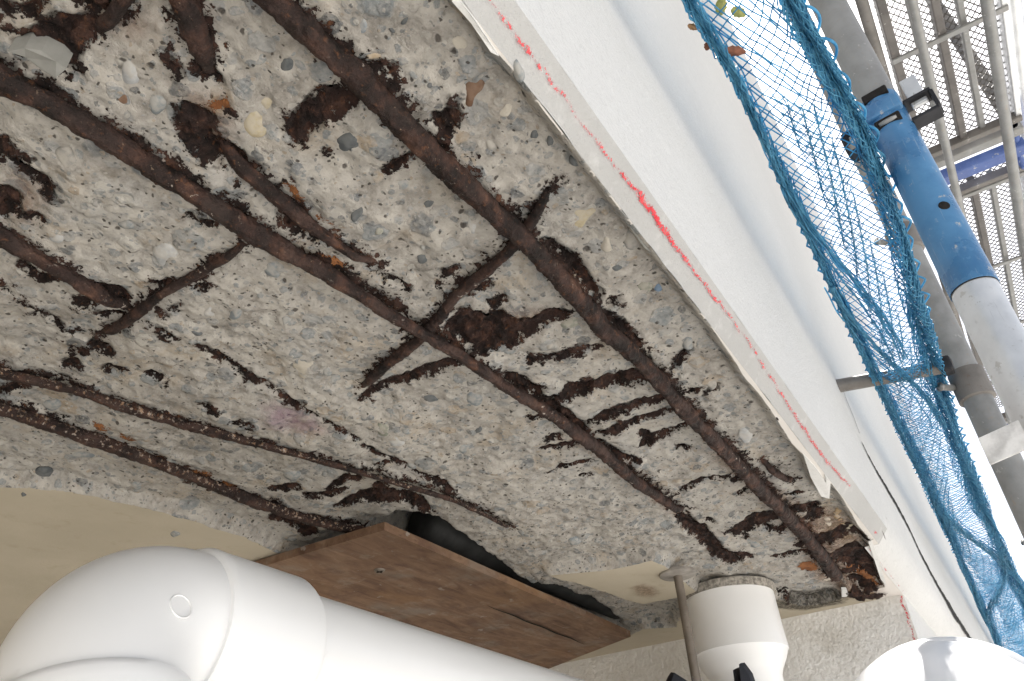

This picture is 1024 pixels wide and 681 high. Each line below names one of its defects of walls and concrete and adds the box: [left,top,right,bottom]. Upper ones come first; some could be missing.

spalling [0,0,508,325]
spalling [0,97,867,635]
corrosion [0,0,885,602]